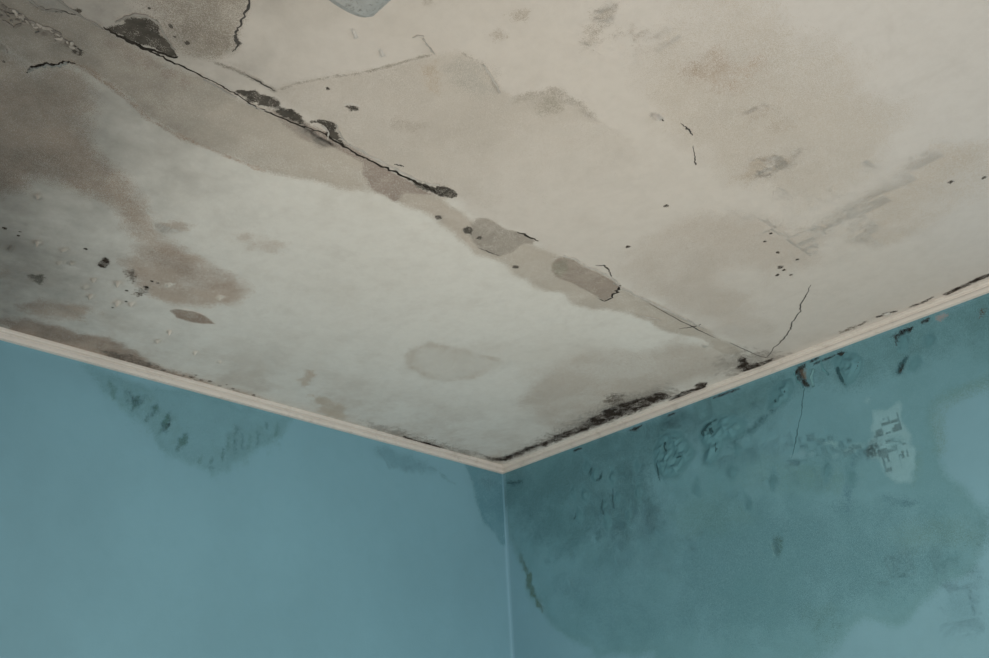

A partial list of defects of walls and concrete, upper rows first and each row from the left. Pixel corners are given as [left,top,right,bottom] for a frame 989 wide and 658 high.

peeling [105,0,347,146]
crack [57,0,436,193]
spalling [407,179,458,199]
damp [0,0,989,485]
crack [613,283,811,358]
damp [465,293,989,658]